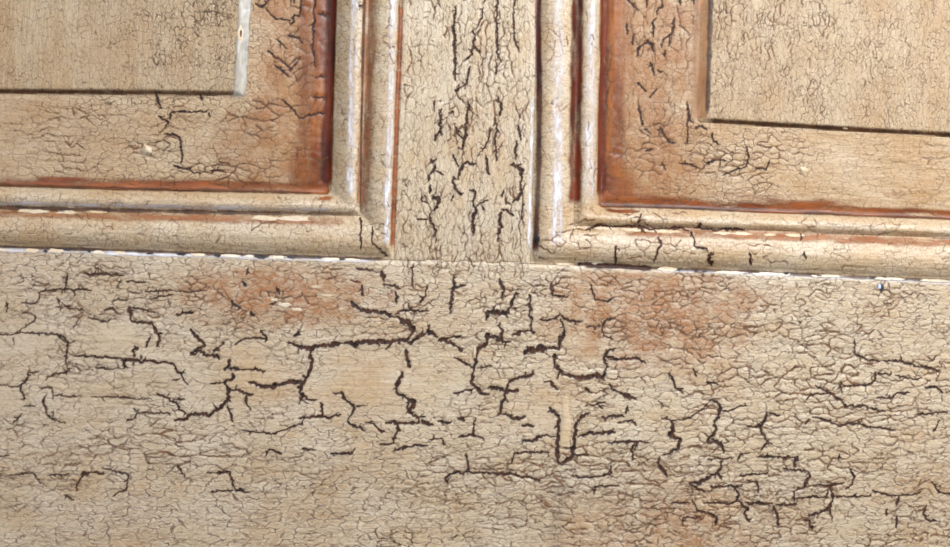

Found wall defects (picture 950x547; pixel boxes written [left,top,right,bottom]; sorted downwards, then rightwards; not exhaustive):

crack [155,92,224,174]
crack [255,0,330,119]
crack [417,0,525,243]
crack [625,0,770,176]
crack [0,213,950,530]